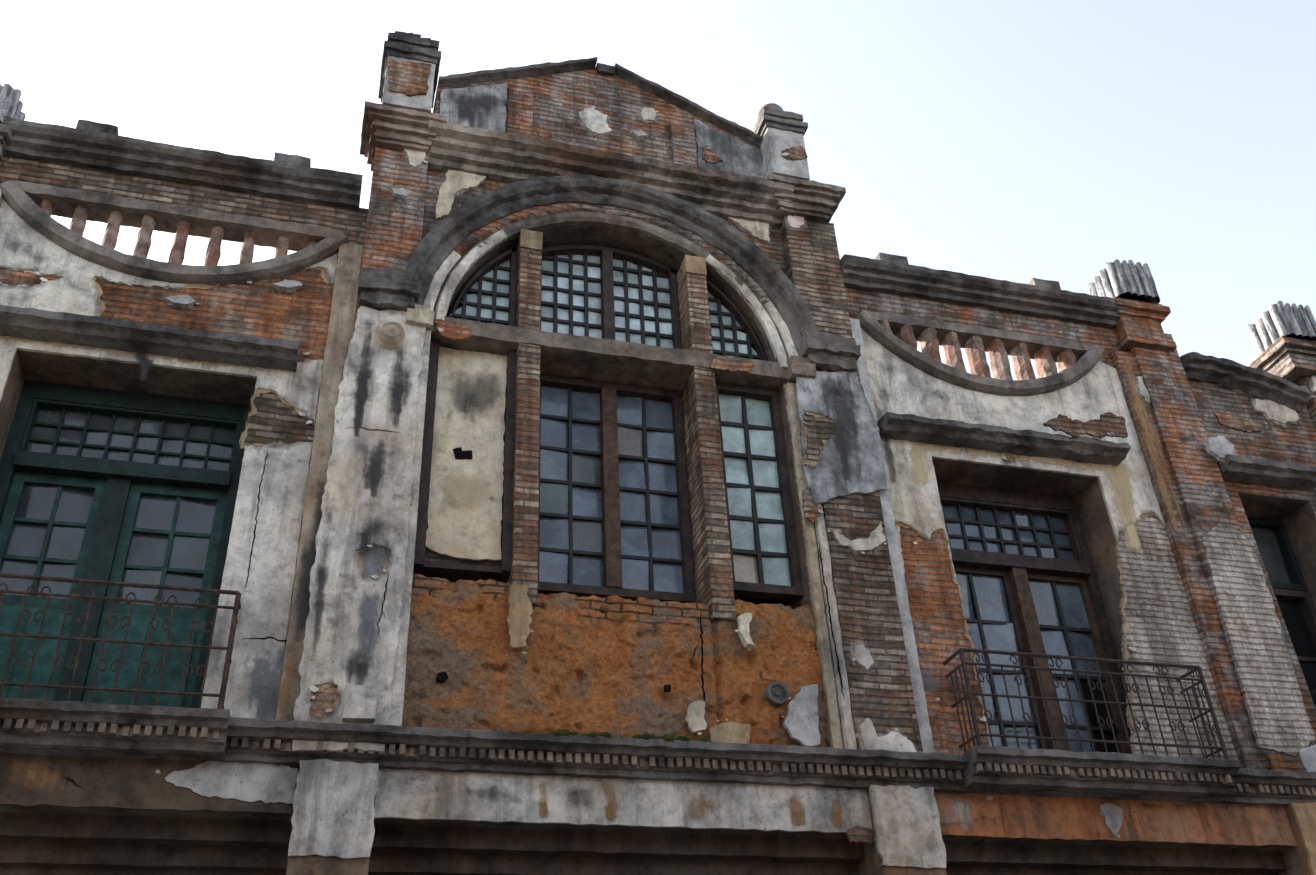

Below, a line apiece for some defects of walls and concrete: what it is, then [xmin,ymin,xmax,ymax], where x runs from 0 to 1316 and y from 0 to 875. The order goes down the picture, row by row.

peeling [435,170,486,221]
flaking render [92,267,334,362]
flaking render [239,388,315,451]
leakage [355,322,372,436]
leakage [390,349,408,424]
leakage [365,442,384,496]
leakage [296,483,325,638]
leakage [362,522,380,553]
leakage [348,596,379,685]
flaking render [402,574,829,747]
flaking render [831,522,991,755]
peeling [155,761,298,804]